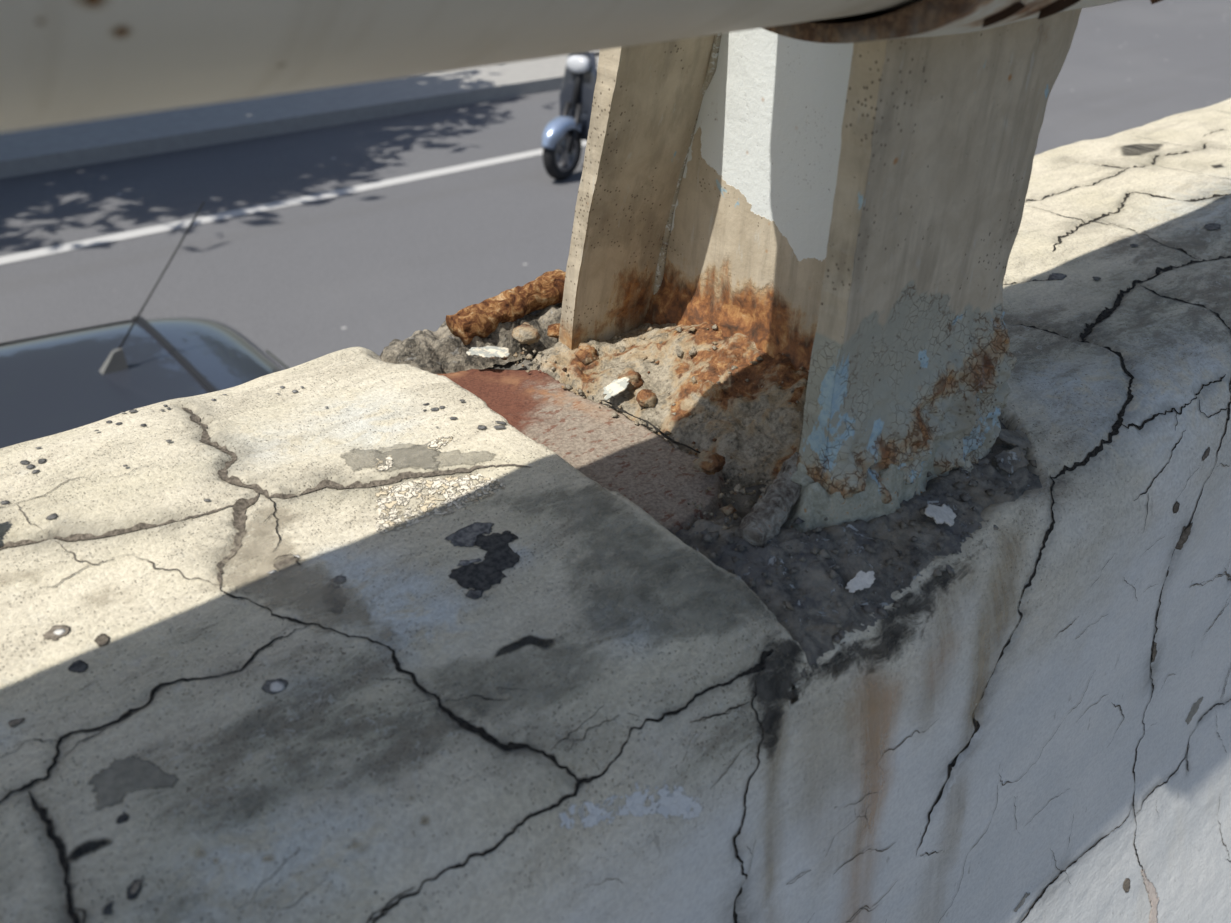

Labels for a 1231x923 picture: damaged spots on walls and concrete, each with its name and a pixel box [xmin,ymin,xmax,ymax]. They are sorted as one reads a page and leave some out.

crack [0,400,774,923]
spalling [374,302,1042,685]
rust [530,322,949,548]
damp [750,557,971,757]
crack [786,129,1231,923]